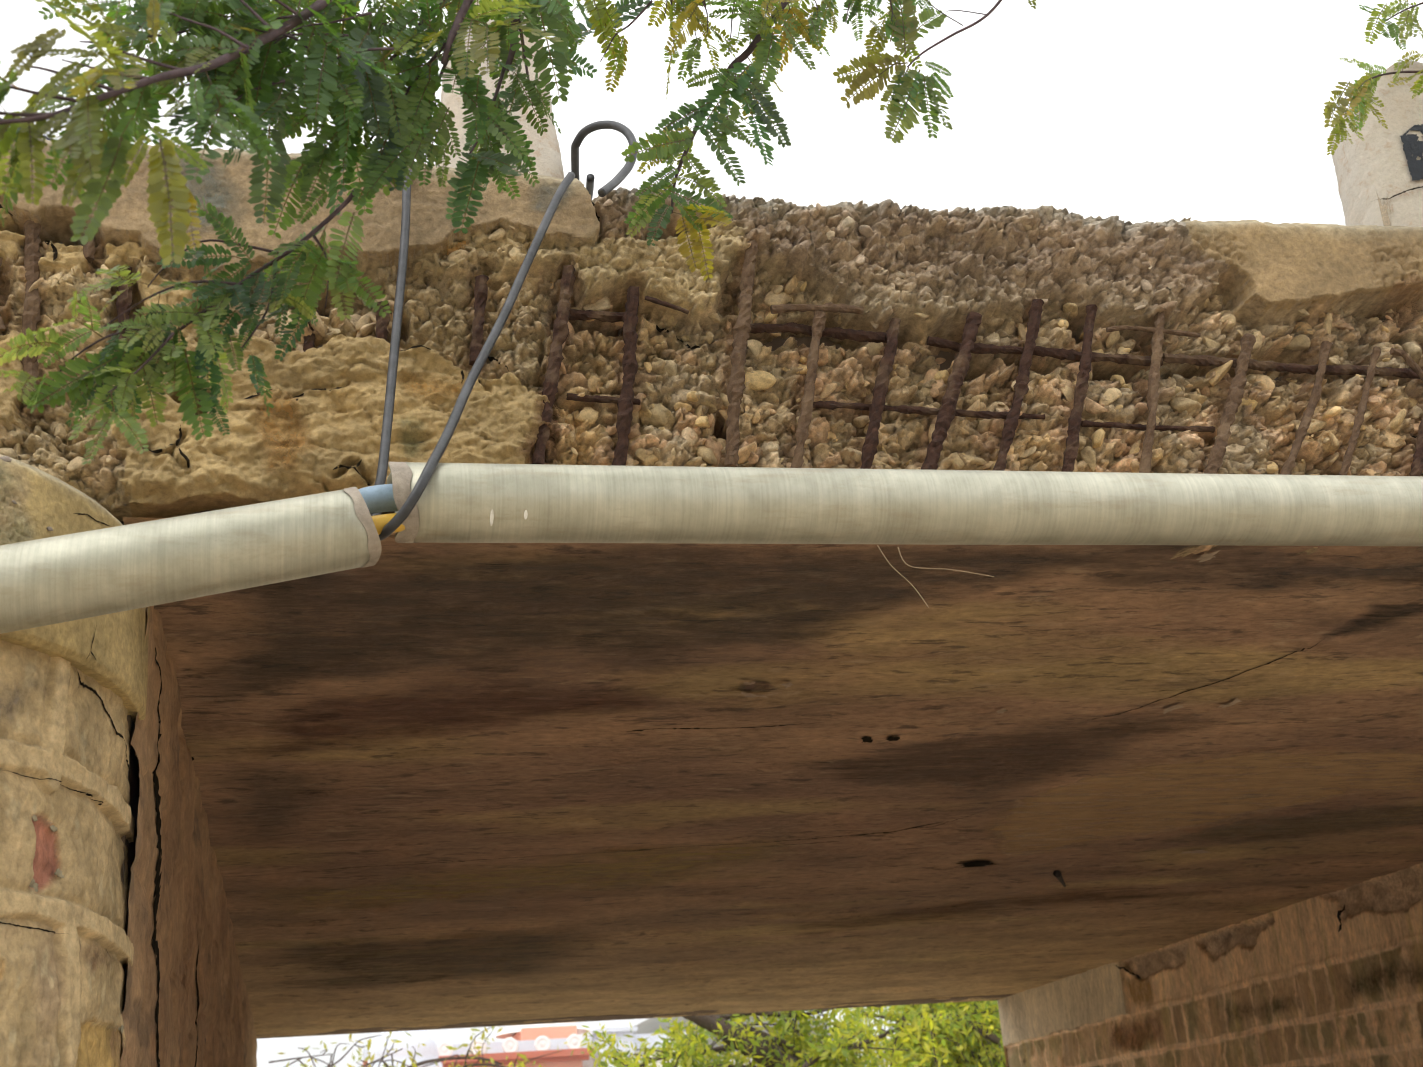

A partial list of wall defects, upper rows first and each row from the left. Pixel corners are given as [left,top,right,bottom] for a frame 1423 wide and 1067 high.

spalling [0,184,1423,545]
spalling [1171,545,1243,562]
crack [1087,637,1326,721]
crack [6,770,103,805]
crack [77,624,162,1067]
spalling [1320,862,1423,920]
crack [0,921,68,934]
spalling [1118,912,1275,981]
crack [193,931,201,1067]